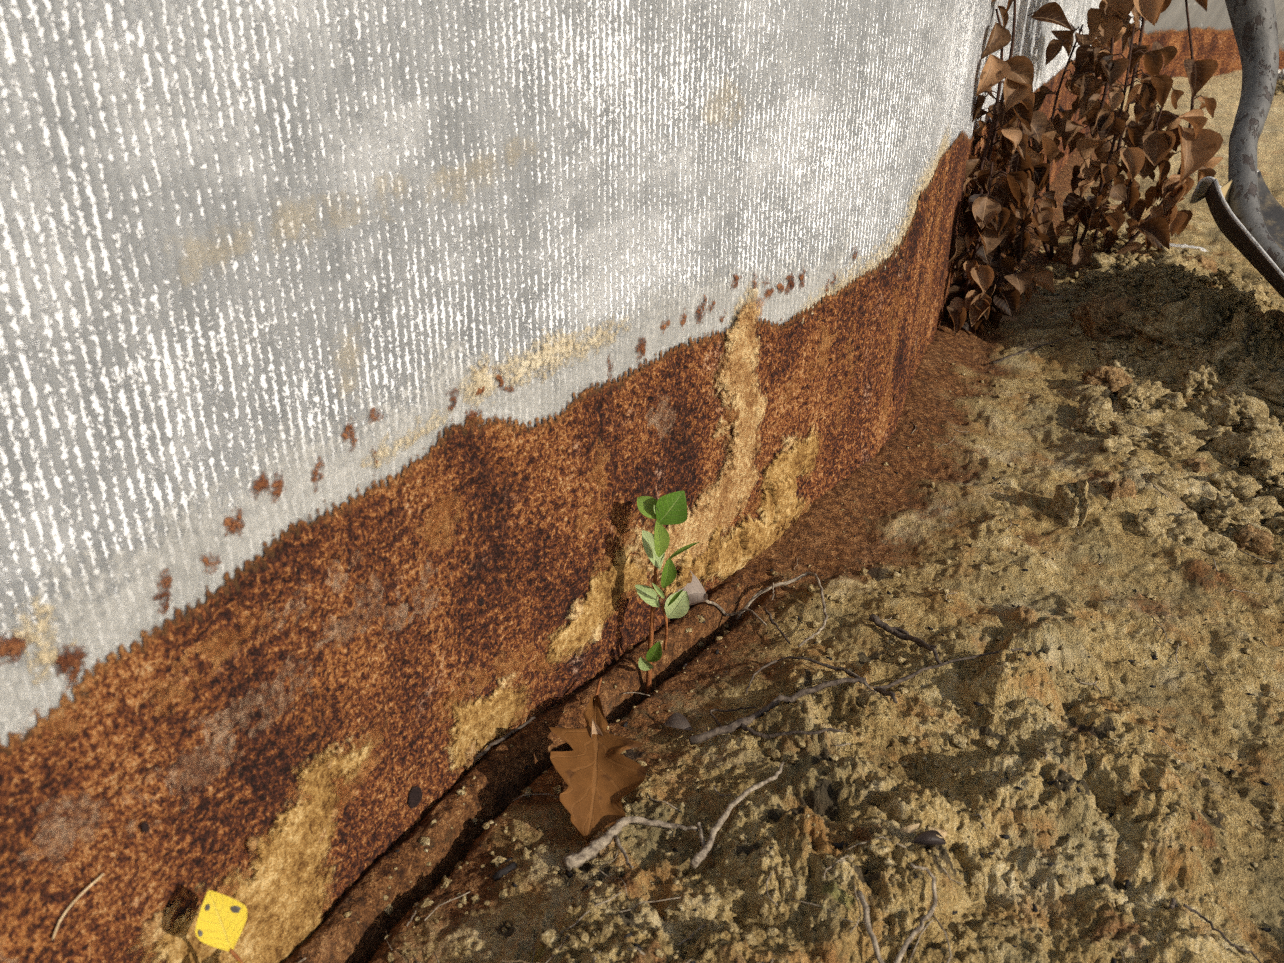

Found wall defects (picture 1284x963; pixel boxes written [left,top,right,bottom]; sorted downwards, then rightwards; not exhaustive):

damp [0,239,851,748]
rust [0,121,992,963]